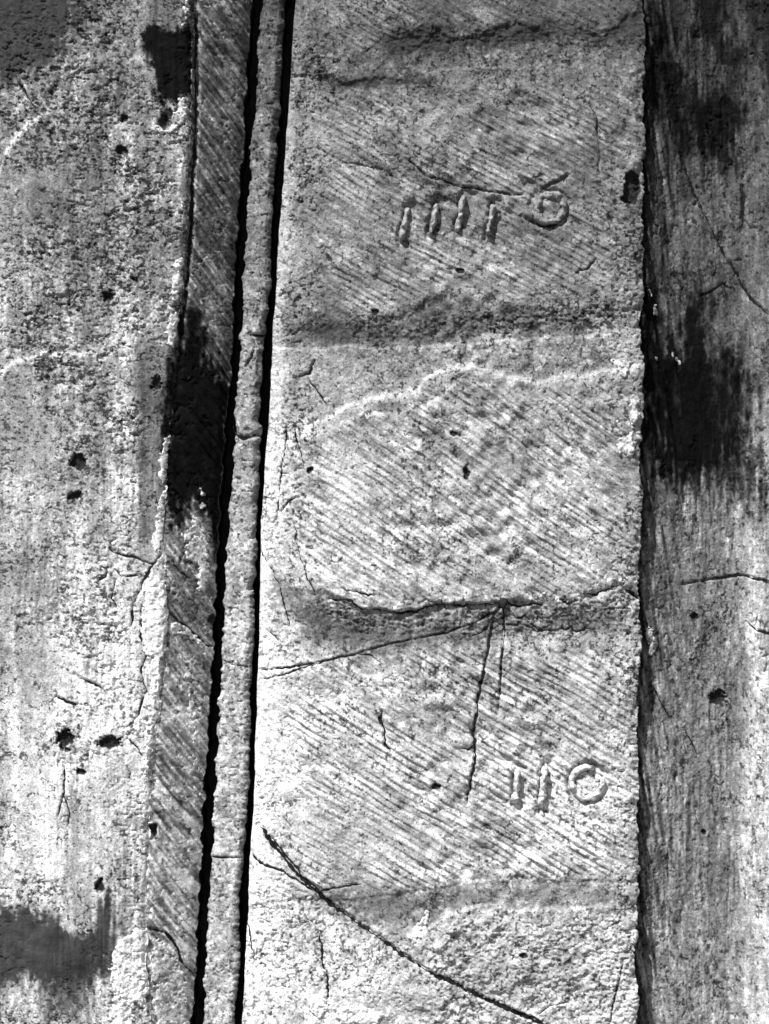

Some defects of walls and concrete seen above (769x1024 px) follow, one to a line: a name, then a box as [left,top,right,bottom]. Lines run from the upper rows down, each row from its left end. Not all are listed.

leakage [141,23,193,128]
leakage [156,306,229,563]
leakage [641,282,767,512]
crack [172,426,641,802]
crack [687,573,769,584]
leakage [0,890,124,1024]
crack [212,827,567,1024]
crack [609,964,623,1023]